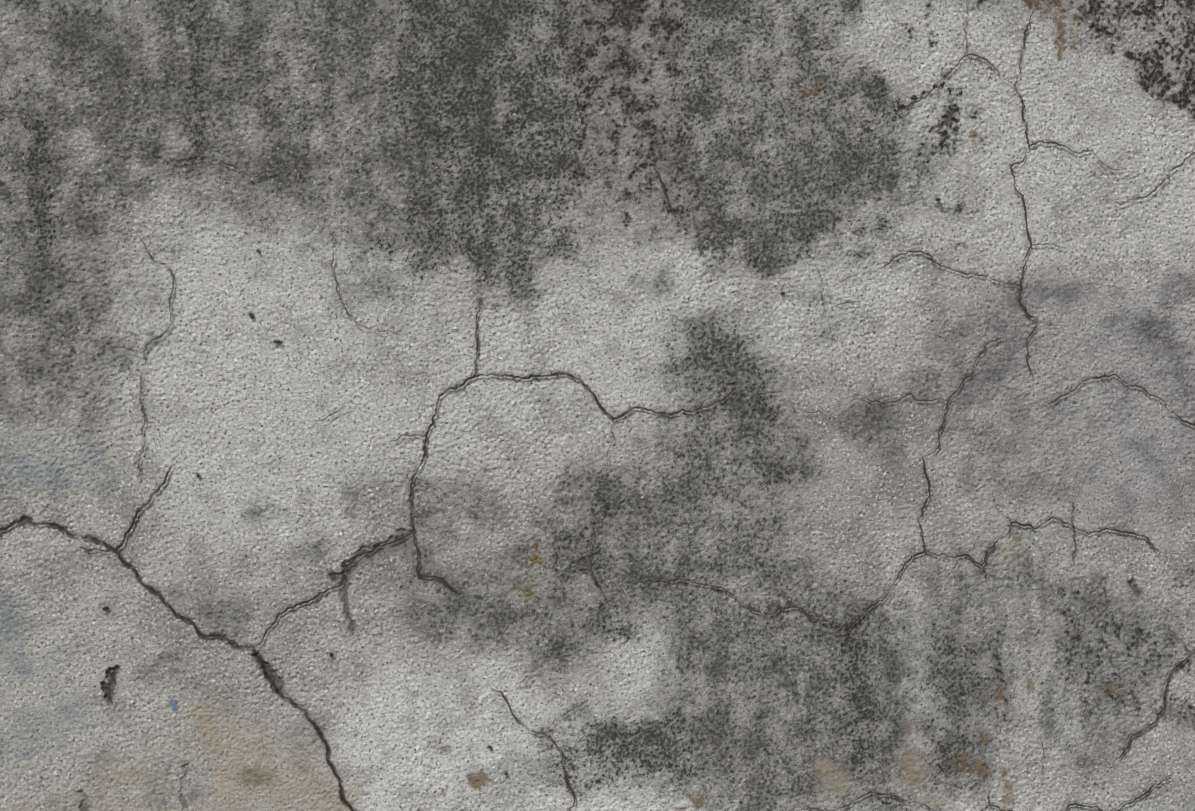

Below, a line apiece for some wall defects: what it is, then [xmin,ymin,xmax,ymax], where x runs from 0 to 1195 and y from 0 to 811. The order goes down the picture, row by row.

leakage [1024,0,1195,118]
leakage [0,0,983,418]
crack [1116,151,1195,205]
crack [644,0,1165,641]
crack [1044,374,1195,426]
crack [0,238,838,811]
leakage [400,315,1040,811]
leakage [976,531,1195,766]
crack [1119,608,1195,759]
peeling [679,787,705,811]
crack [788,757,935,811]
crack [1065,777,1190,811]